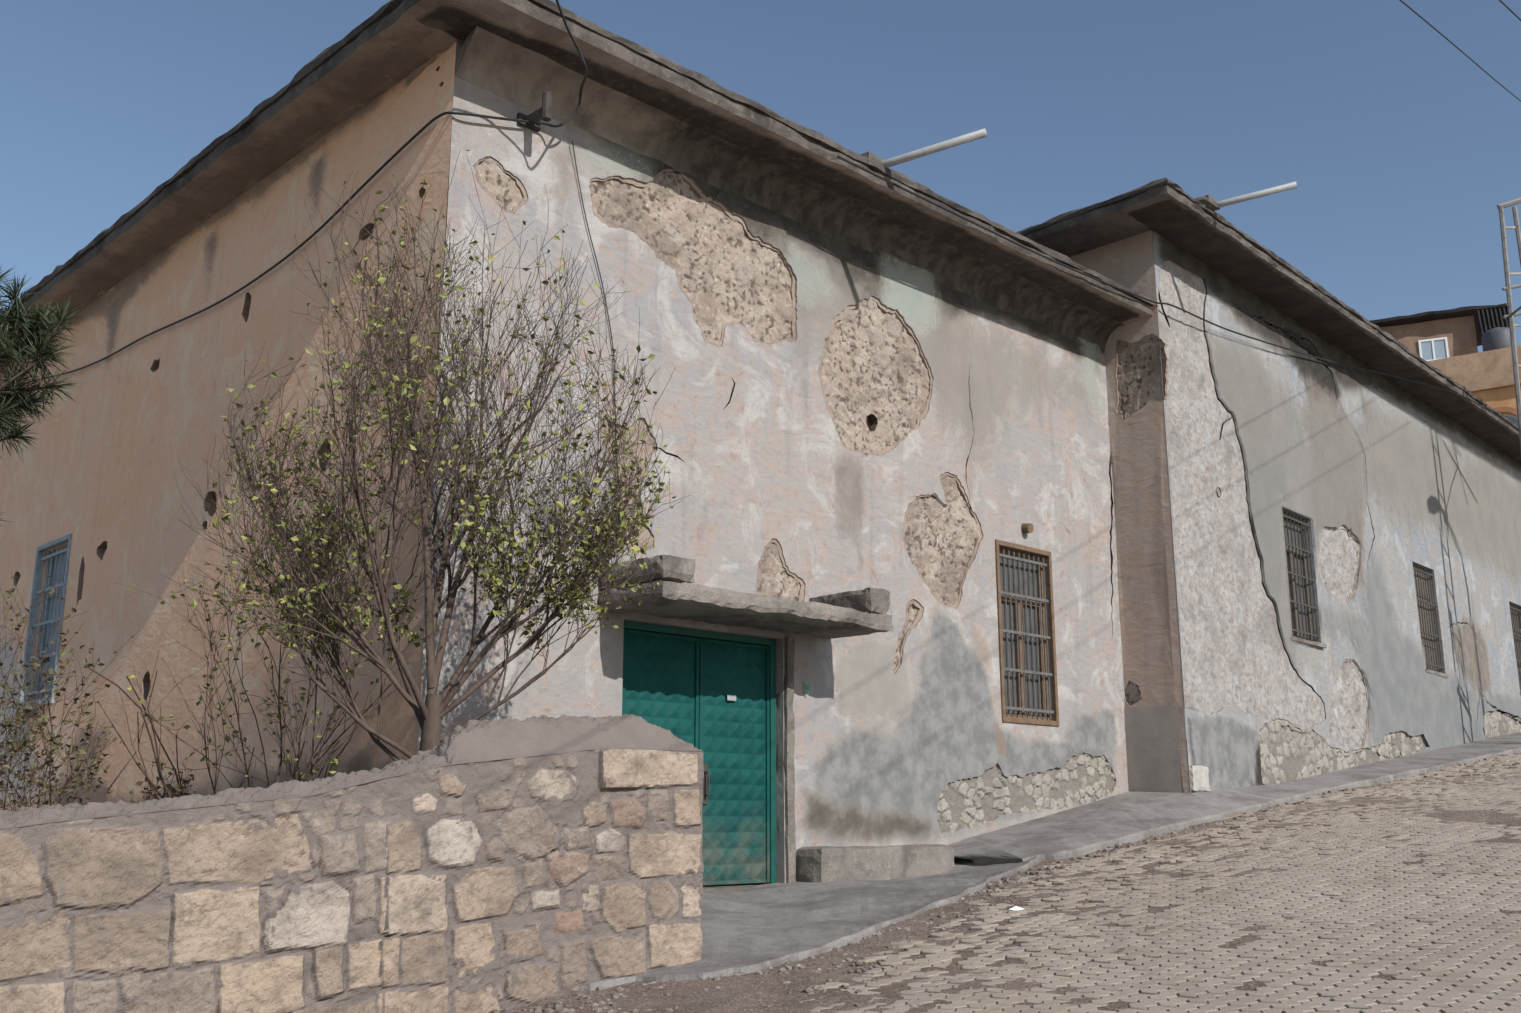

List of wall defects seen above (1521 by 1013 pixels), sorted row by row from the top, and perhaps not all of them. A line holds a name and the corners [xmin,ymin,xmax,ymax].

spalling [473,156,529,214]
spalling [589,169,798,347]
spalling [817,296,934,457]
spalling [756,538,806,602]
spalling [893,472,984,675]
crack [1158,279,1326,719]
flaking render [1115,260,1369,756]
crack [1363,463,1375,579]
water stain [806,794,932,840]